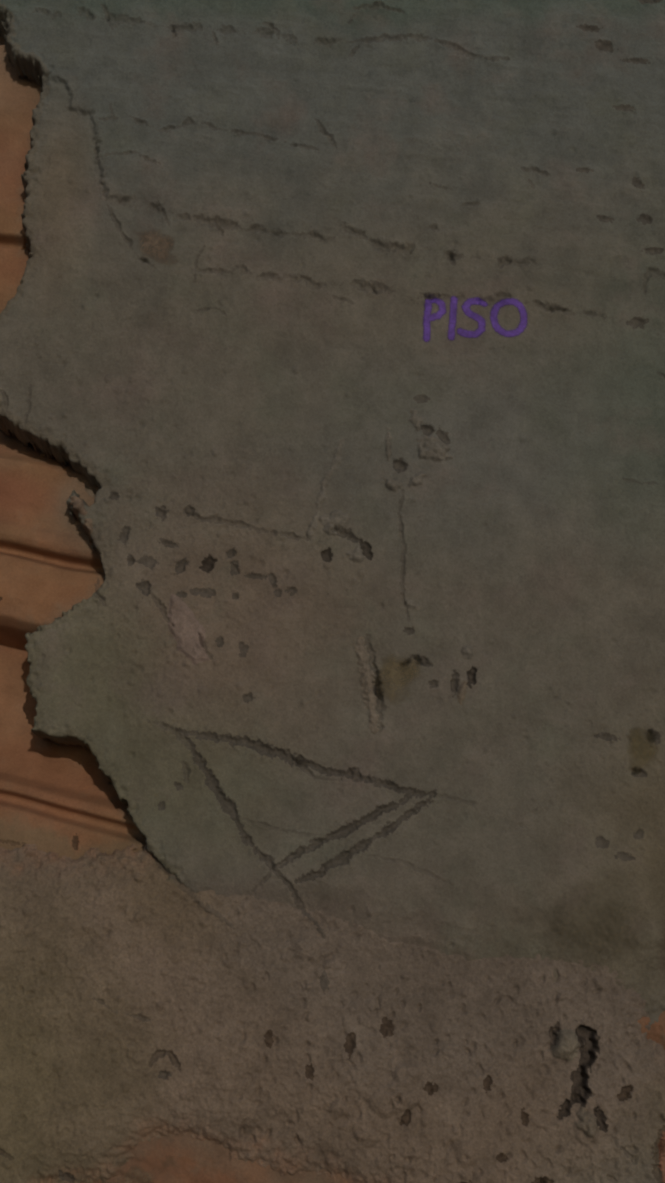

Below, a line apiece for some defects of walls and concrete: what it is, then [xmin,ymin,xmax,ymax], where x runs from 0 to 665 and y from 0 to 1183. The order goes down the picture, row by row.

crack [32,0,510,62]
spalling [0,0,51,321]
crack [93,103,607,320]
spalling [0,403,120,545]
spalling [118,525,159,599]
spalling [157,538,297,598]
spalling [344,1032,356,1059]
spalling [379,1017,394,1039]
spalling [651,1118,665,1183]